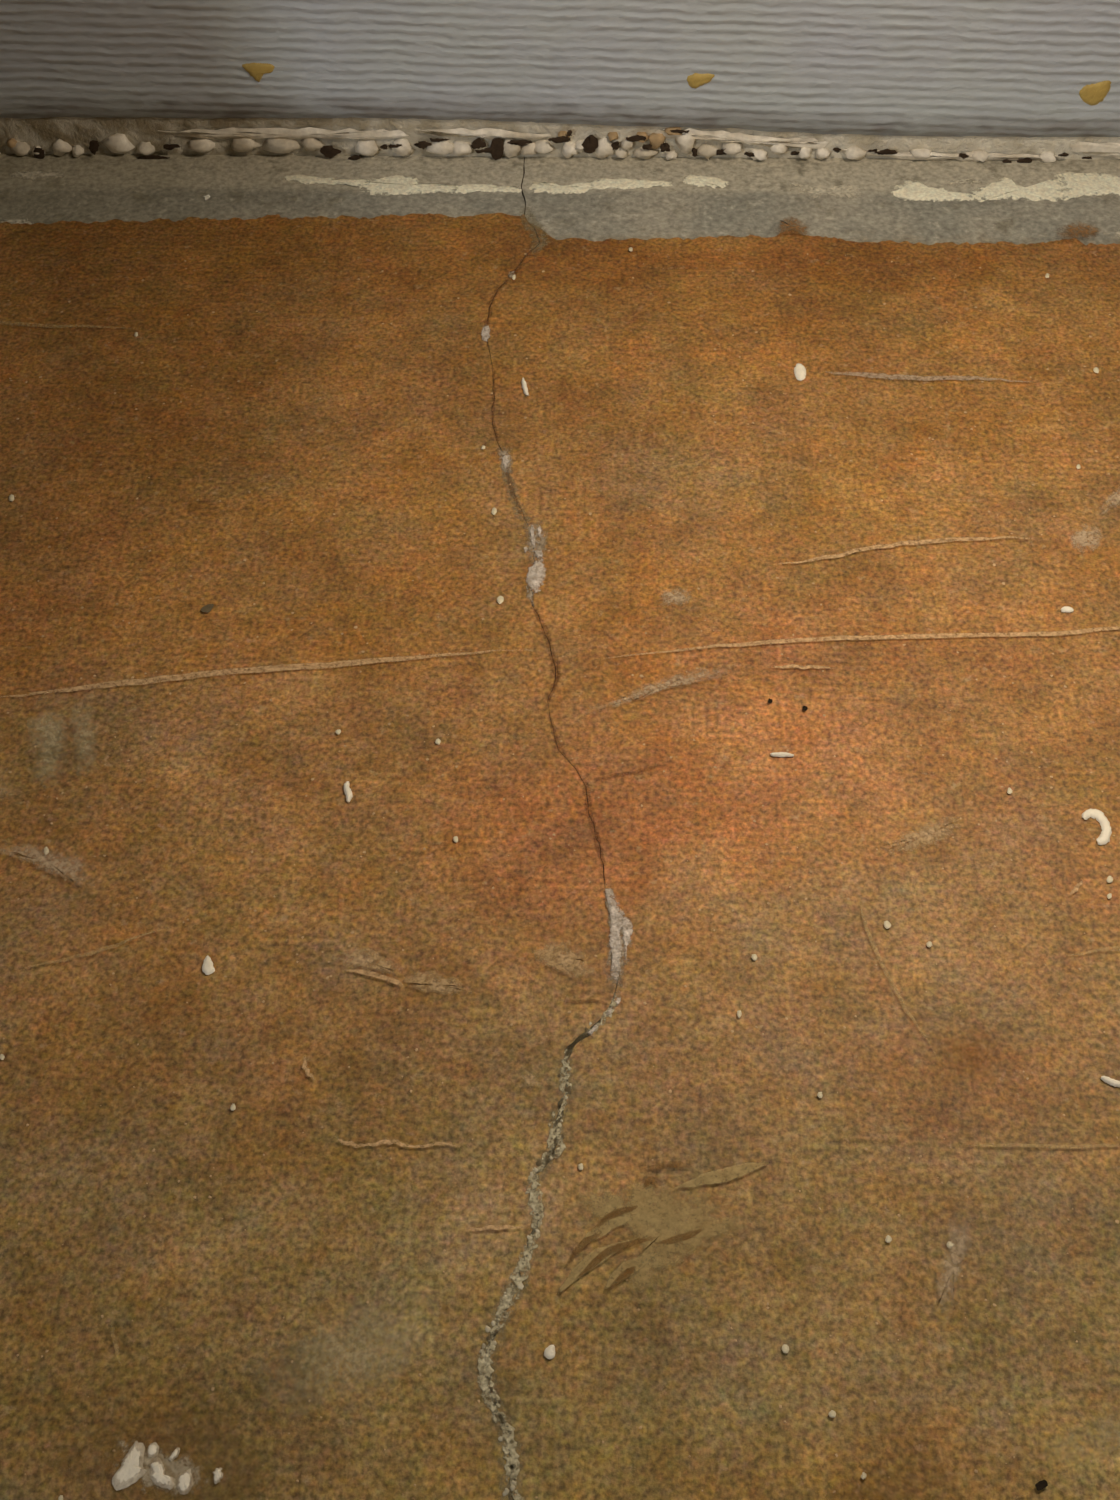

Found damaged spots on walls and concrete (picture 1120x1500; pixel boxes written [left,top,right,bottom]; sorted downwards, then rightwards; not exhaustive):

crack [477,157,619,1500]